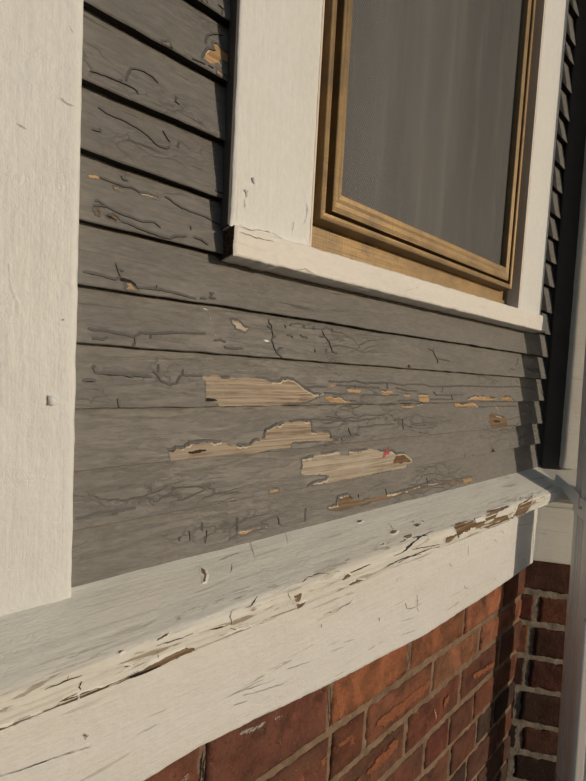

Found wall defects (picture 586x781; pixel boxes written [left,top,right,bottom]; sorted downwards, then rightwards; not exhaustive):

peeling [201,41,228,78]
crack [91,67,159,94]
crack [92,106,180,149]
crack [94,196,308,245]
crack [83,263,216,300]
crack [89,327,244,350]
crack [267,319,338,358]
peeling [202,374,362,406]
peeling [167,419,412,487]
peeling [327,475,473,512]
peeling [444,493,534,543]
peeling [0,646,198,731]